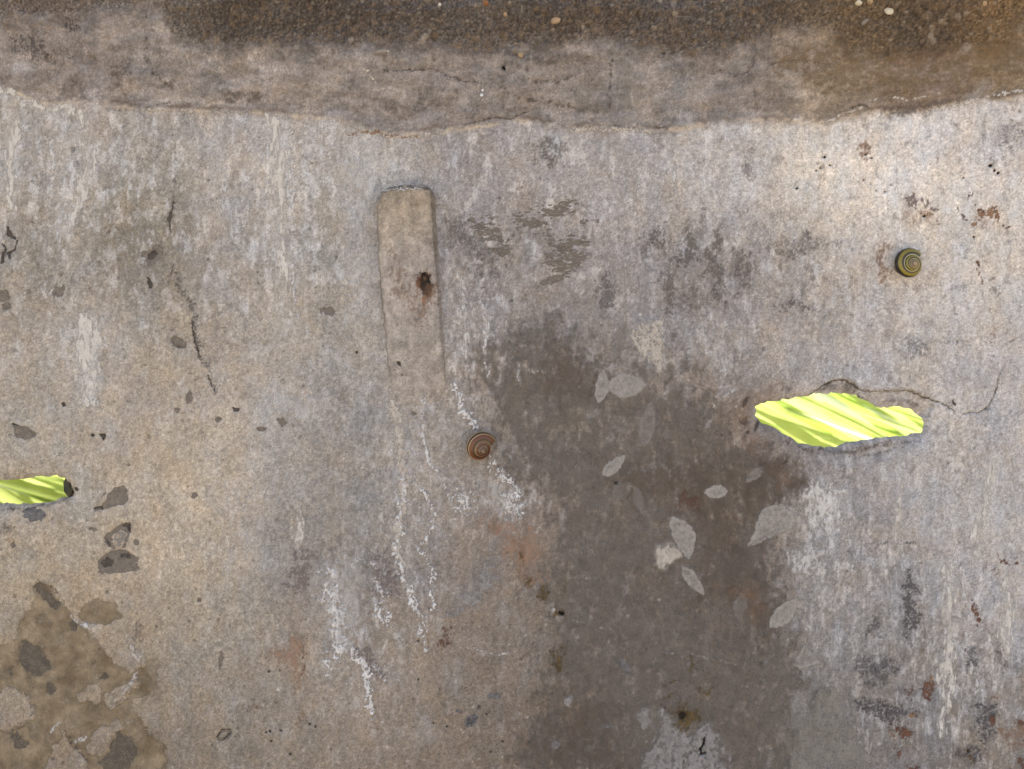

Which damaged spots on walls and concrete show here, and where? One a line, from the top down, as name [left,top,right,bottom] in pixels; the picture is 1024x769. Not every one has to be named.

crack [167,201,175,230]
crack [172,265,216,395]
corrosion [416,272,435,306]
efflorescence [450,382,479,433]
crack [809,378,998,413]
damp [282,394,507,722]
damp [459,280,848,769]
peeling [0,581,167,769]